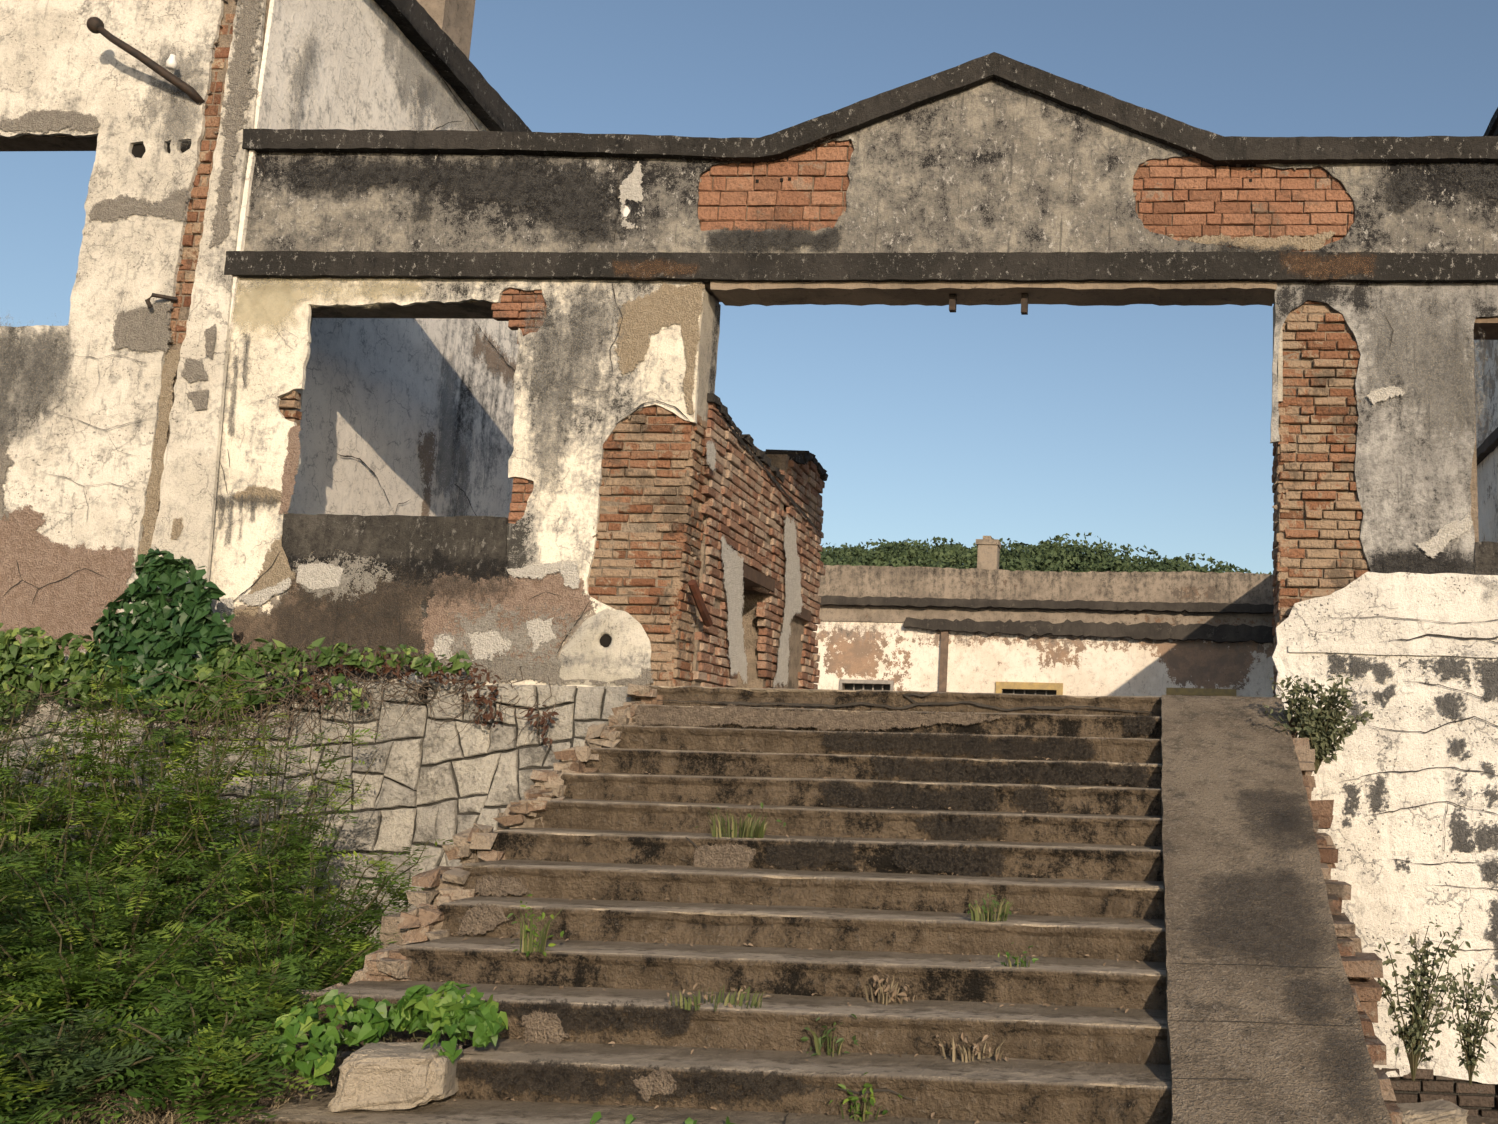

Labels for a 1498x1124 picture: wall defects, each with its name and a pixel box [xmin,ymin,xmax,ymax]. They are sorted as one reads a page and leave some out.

leakage [287,153,623,244]
spalling [698,141,854,232]
spalling [1132,157,1354,252]
flaking render [0,0,266,656]
flaking render [211,282,717,687]
spalling [1272,301,1405,622]
crack [5,560,109,603]
flaking render [721,536,748,684]
flaking render [773,515,804,688]
leakage [1190,791,1337,1022]